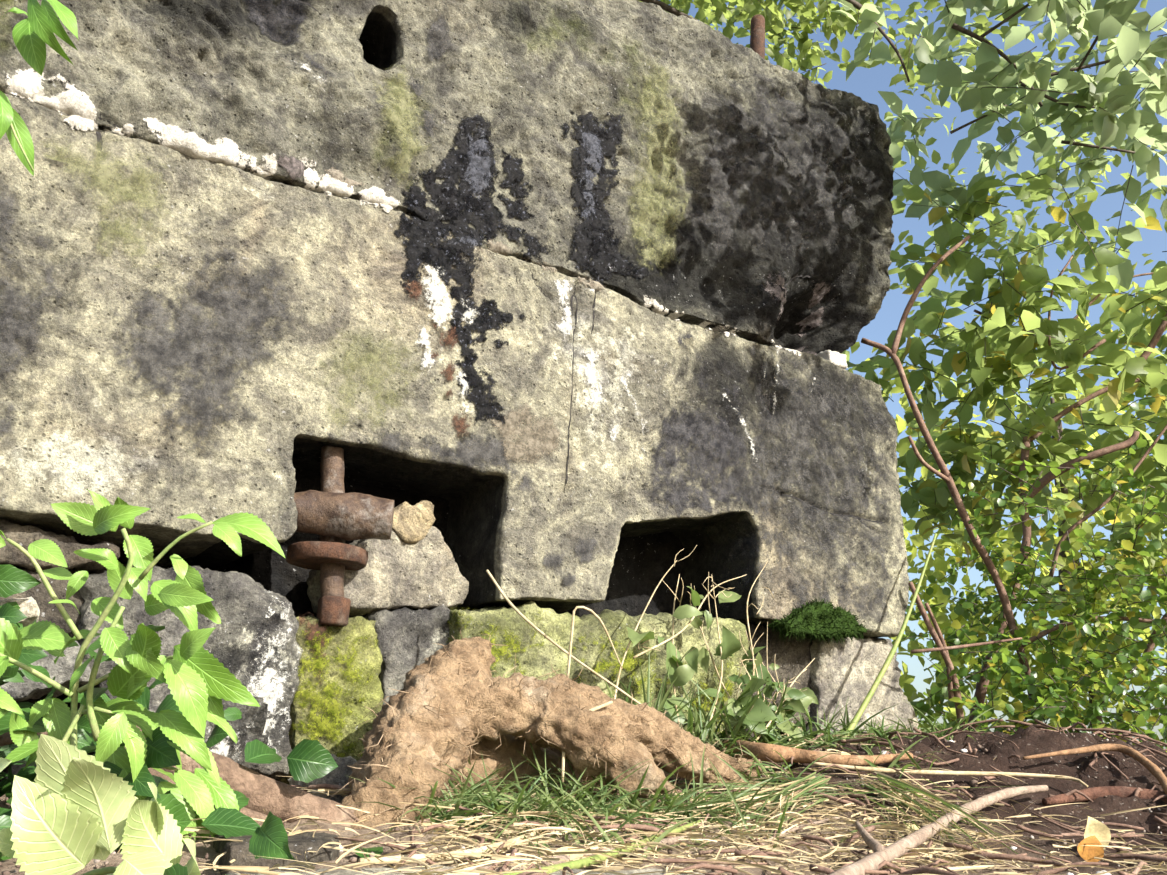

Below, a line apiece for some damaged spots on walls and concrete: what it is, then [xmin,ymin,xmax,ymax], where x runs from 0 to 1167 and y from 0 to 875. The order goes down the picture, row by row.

water stain [426,12,454,61]
water stain [378,66,551,425]
water stain [581,350,603,404]
water stain [554,63,688,338]